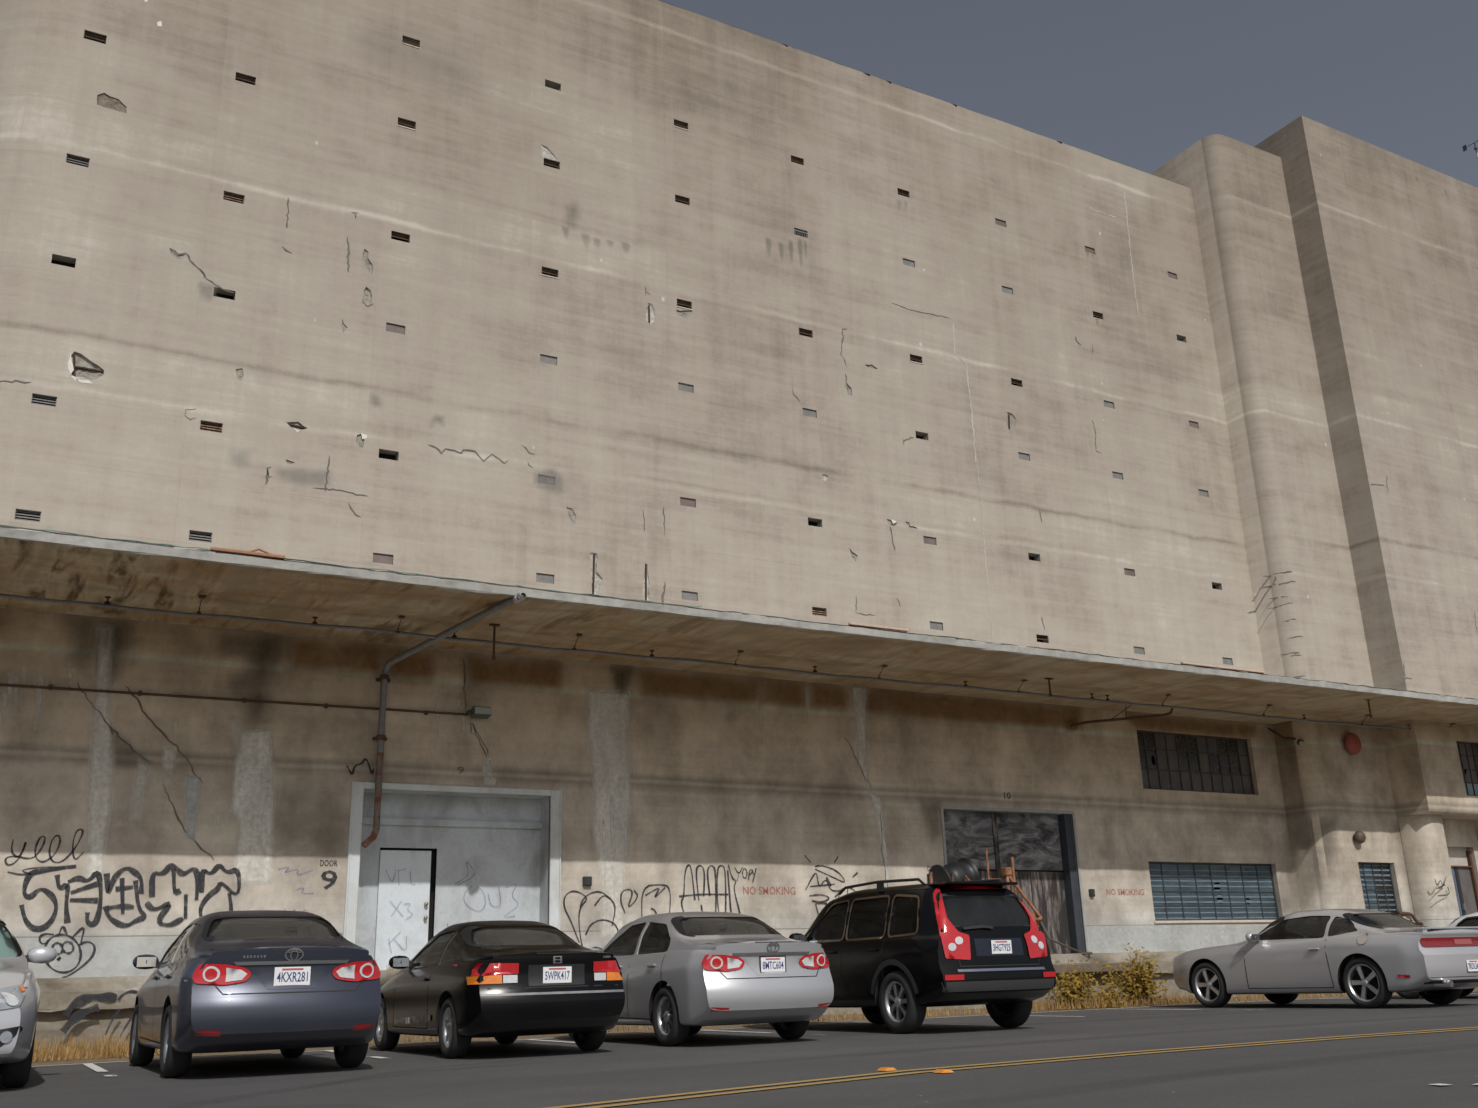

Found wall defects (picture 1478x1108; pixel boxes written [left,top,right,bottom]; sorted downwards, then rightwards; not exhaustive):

spalling [97,93,127,113]
crack [170,248,233,293]
spalling [68,351,104,384]
crack [428,444,533,468]
crack [78,683,214,860]